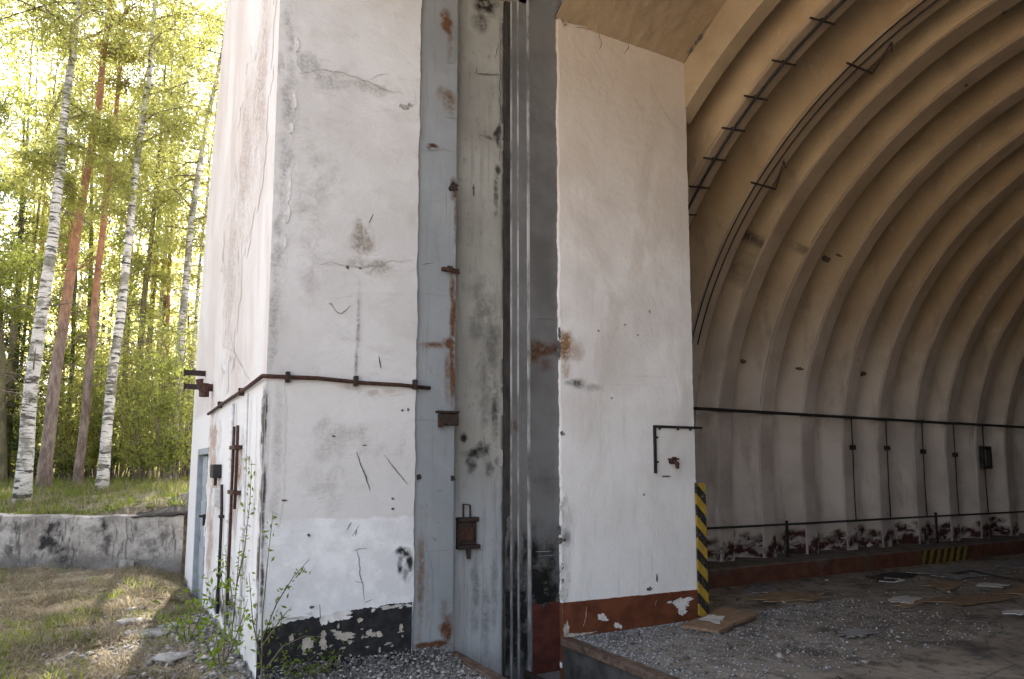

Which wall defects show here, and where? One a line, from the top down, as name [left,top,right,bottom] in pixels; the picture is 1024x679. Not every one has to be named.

crack [300,69,403,94]
corrosion [438,6,455,63]
spalling [204,0,412,668]
leakage [218,0,415,394]
crack [320,260,432,268]
corrosion [416,267,456,411]
leakage [458,262,503,482]
corrosion [531,327,587,381]
leakage [95,518,116,559]
corrosion [412,501,453,655]
leakage [467,503,577,679]
peeling [667,597,694,616]